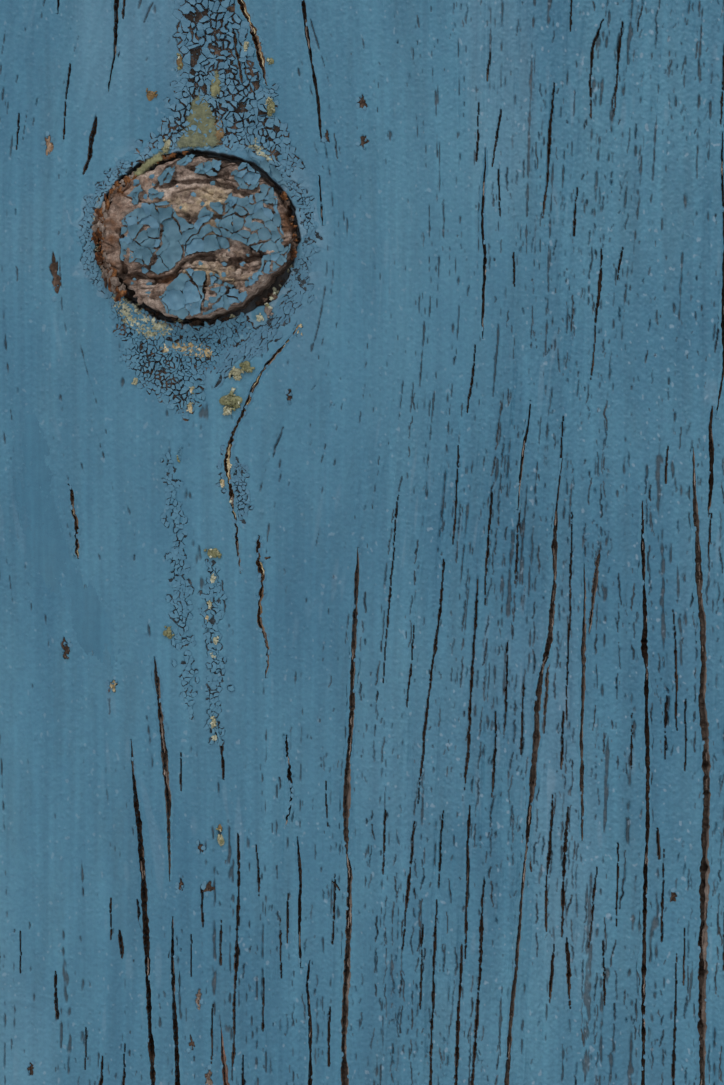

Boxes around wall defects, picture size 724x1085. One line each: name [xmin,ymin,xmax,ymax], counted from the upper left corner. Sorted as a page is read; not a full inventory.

crack [63,0,326,1085]
peeling [119,150,291,319]
crack [262,53,724,1085]
crack [570,0,623,117]